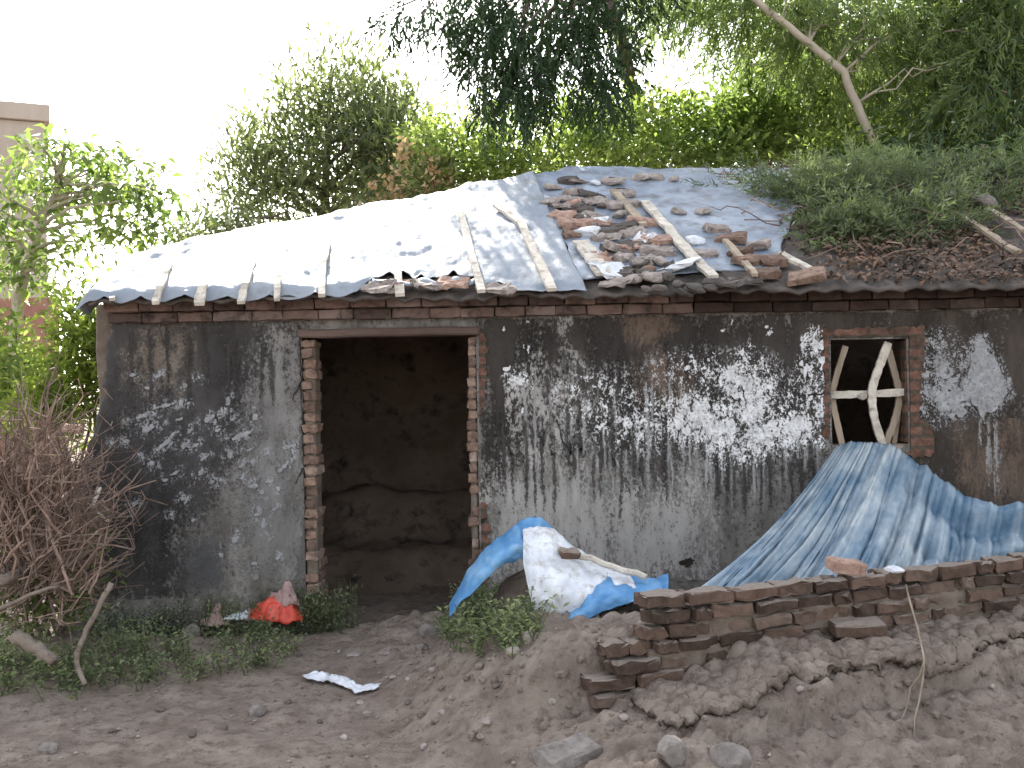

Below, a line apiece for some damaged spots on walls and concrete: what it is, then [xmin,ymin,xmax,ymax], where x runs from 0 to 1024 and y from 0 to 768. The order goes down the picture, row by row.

damp [77,321,310,601]
peeling [105,368,299,570]
peeling [502,366,539,390]
damp [476,312,832,583]
peeling [551,324,1016,473]